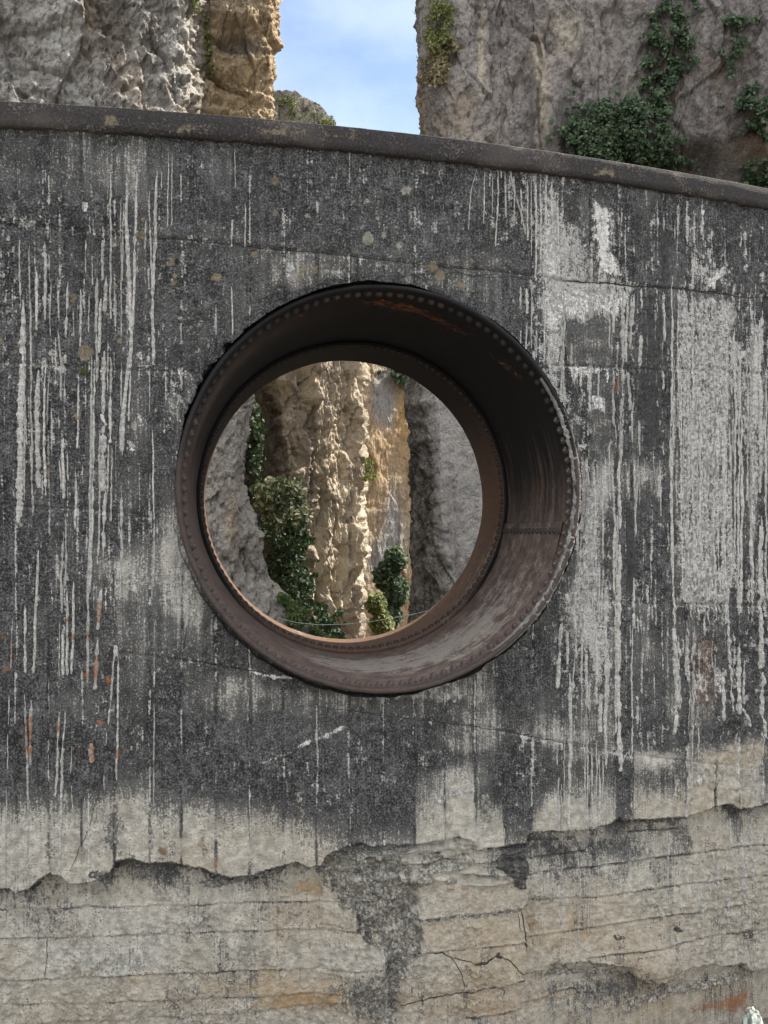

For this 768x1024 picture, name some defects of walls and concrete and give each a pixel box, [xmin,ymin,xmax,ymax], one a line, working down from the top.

water stain [15,152,173,690]
water stain [468,169,768,832]
water stain [10,550,39,673]
water stain [103,645,120,787]
water stain [24,695,33,889]
water stain [54,711,90,884]
spalling [85,804,287,888]
spalling [323,844,552,1023]
crack [399,911,535,1007]
spalling [540,961,622,977]
spalling [621,963,754,1014]